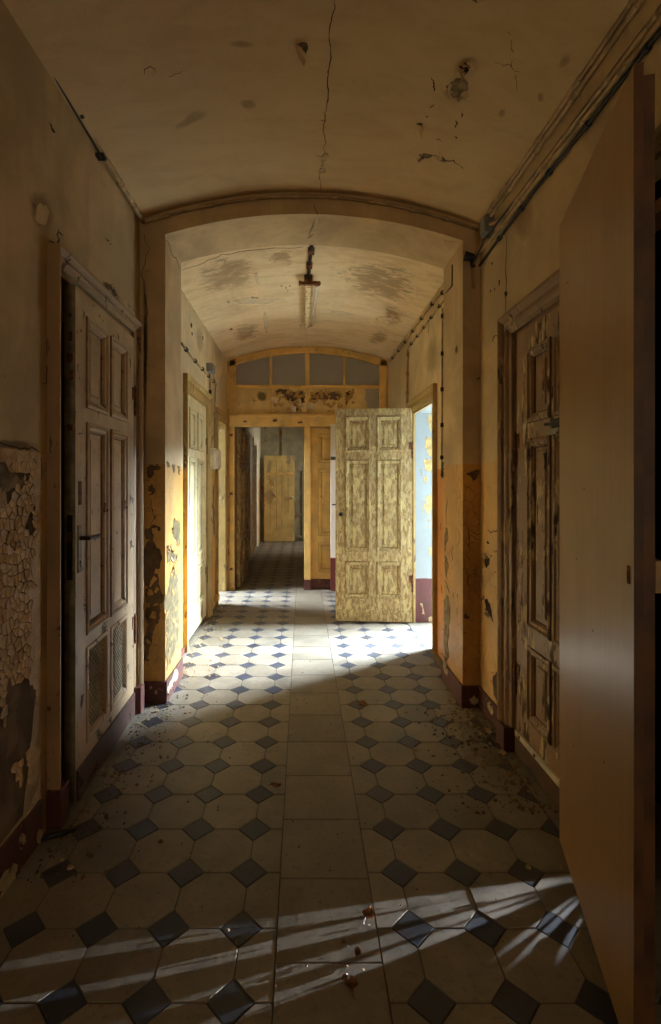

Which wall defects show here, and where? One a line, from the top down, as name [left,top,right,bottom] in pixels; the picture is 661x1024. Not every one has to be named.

crack [314,3,336,215]
crack [426,78,463,168]
spalling [443,59,478,103]
peeling [270,388,355,424]
peeling [144,461,181,497]
peeling [0,448,44,849]
peeling [143,518,181,696]
spalling [481,595,493,621]